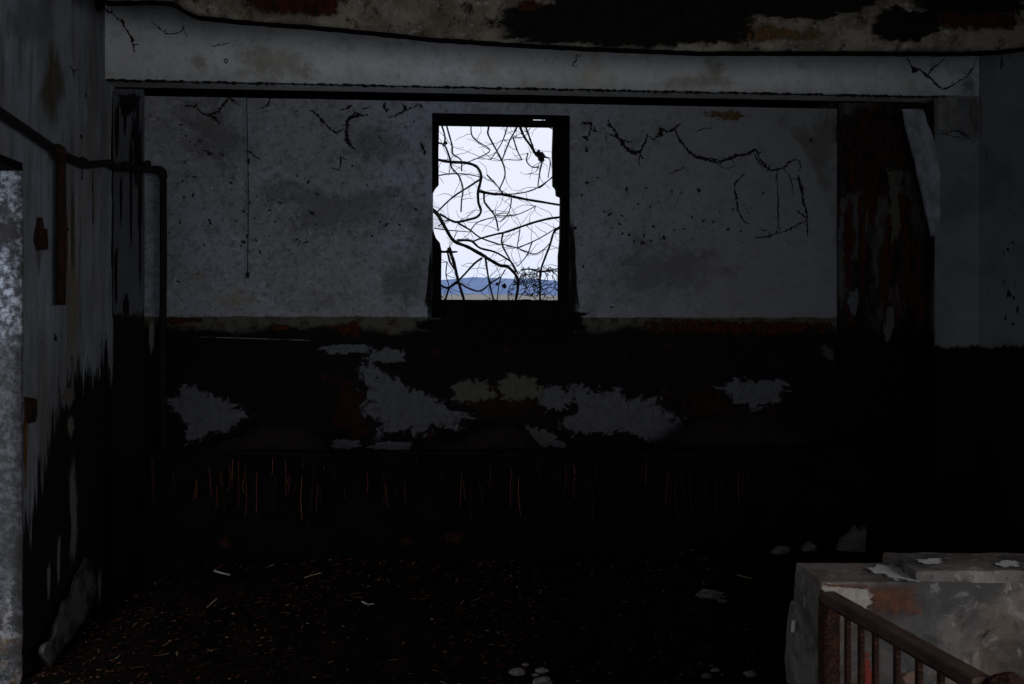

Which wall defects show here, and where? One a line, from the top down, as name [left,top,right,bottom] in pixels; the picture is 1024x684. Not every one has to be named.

crack [105,8,187,52]
crack [906,56,1003,90]
crack [184,97,236,125]
crack [309,103,423,170]
crack [581,120,808,238]
peeling [166,384,254,446]
peeling [316,344,688,450]
peeling [714,376,791,413]
peeling [821,583,874,609]